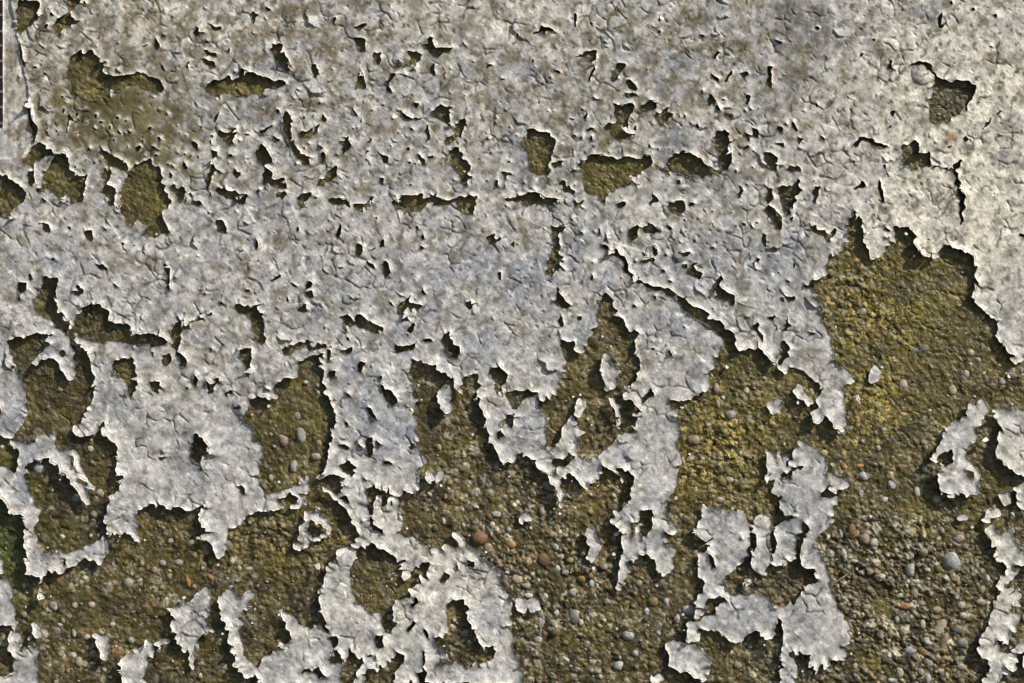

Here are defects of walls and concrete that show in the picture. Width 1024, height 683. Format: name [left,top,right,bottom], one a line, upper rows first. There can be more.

peeling [0,20,481,242]
peeling [492,46,824,270]
peeling [924,75,981,131]
peeling [0,207,1024,683]